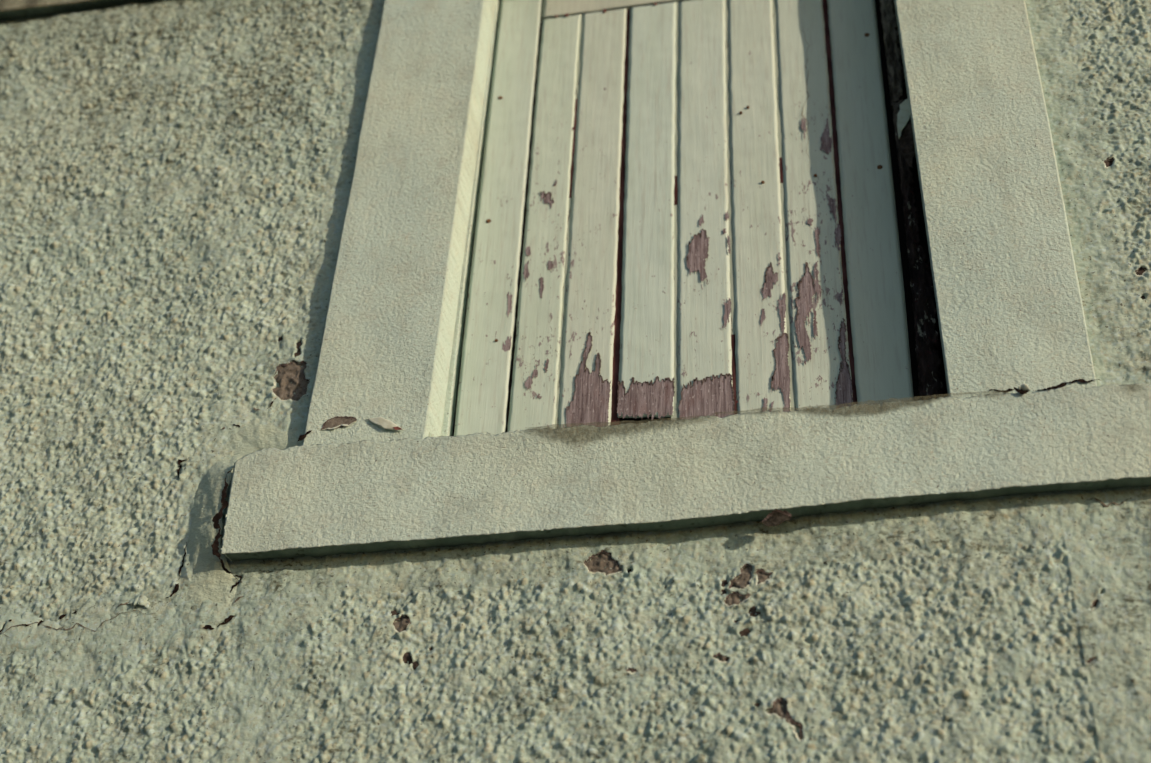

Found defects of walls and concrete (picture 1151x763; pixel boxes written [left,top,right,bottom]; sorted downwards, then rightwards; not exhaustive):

peeling [686,214,710,285]
peeling [759,218,822,412]
spalling [253,340,310,410]
peeling [565,332,735,427]
crack [990,379,1099,394]
spalling [298,416,403,441]
crack [0,467,244,637]
spalling [583,550,632,576]
spalling [391,610,411,633]
spalling [721,564,772,637]
spalling [403,652,419,670]
spalling [754,697,803,741]